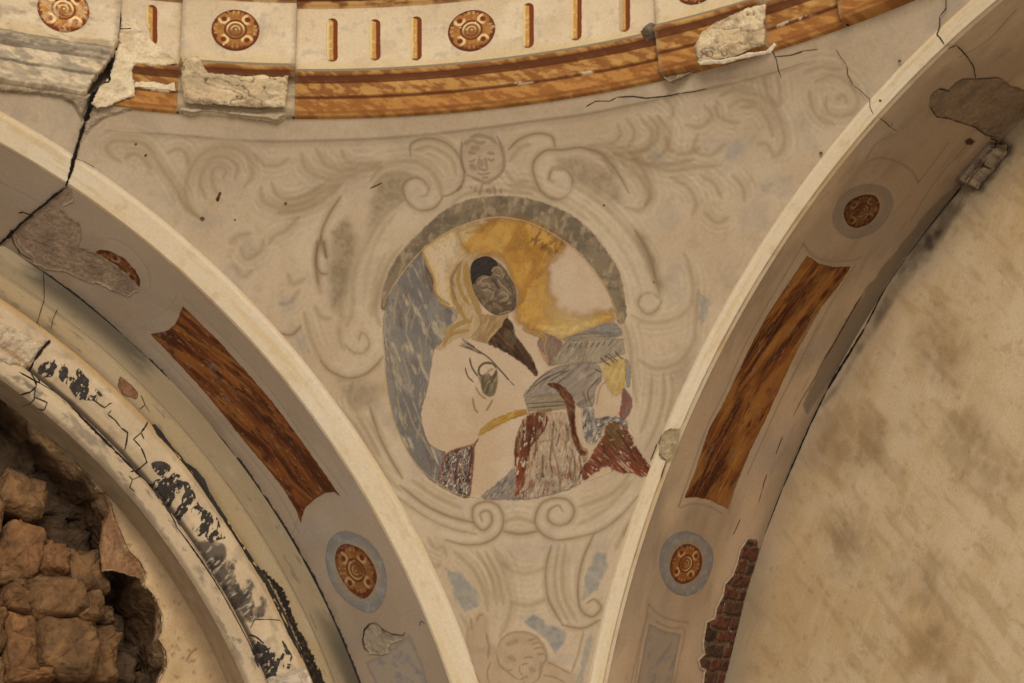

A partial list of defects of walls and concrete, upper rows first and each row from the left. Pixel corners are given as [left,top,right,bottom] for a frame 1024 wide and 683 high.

peeling [134,81,176,91]
crack [772,49,896,131]
crack [936,0,976,79]
flaking render [929,78,1024,190]
crack [0,13,278,681]
spalling [0,399,167,683]
crack [214,430,361,683]
mould [261,570,325,683]
flaking render [362,623,406,655]
flaking render [697,539,760,683]